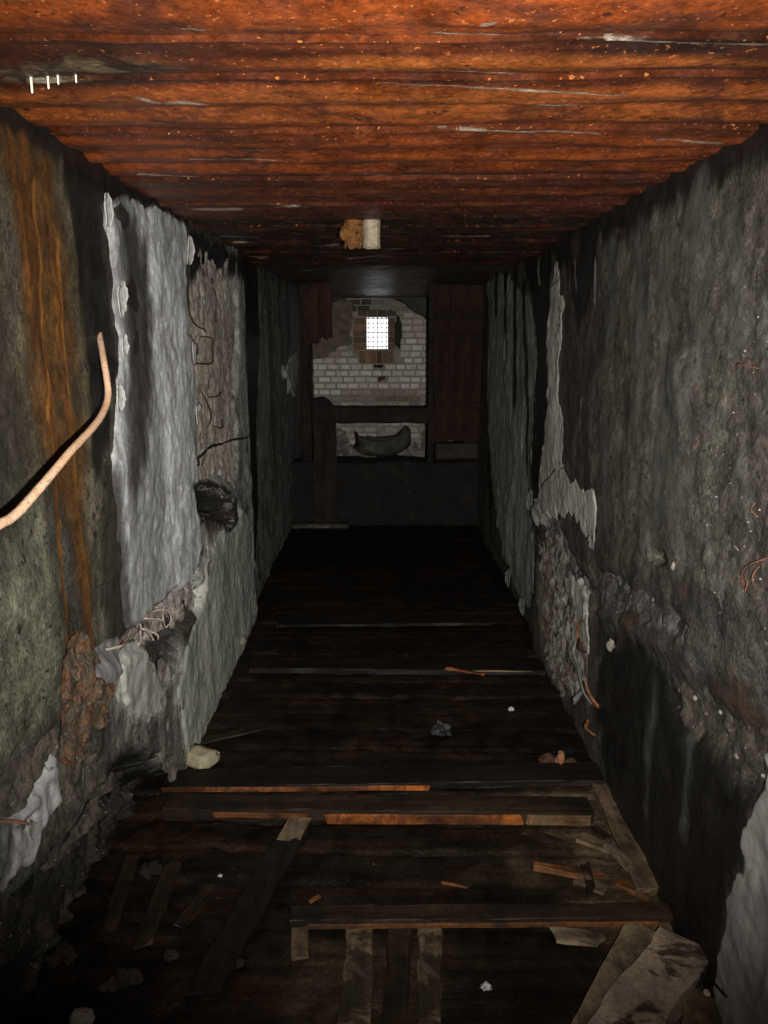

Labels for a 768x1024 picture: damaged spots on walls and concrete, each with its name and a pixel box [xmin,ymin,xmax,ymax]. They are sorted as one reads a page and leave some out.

corrosion [0,129,116,771]
flaking render [0,193,238,782]
crack [197,435,250,469]
flaking render [487,261,688,703]
spalling [0,728,114,892]
damp [596,638,753,986]